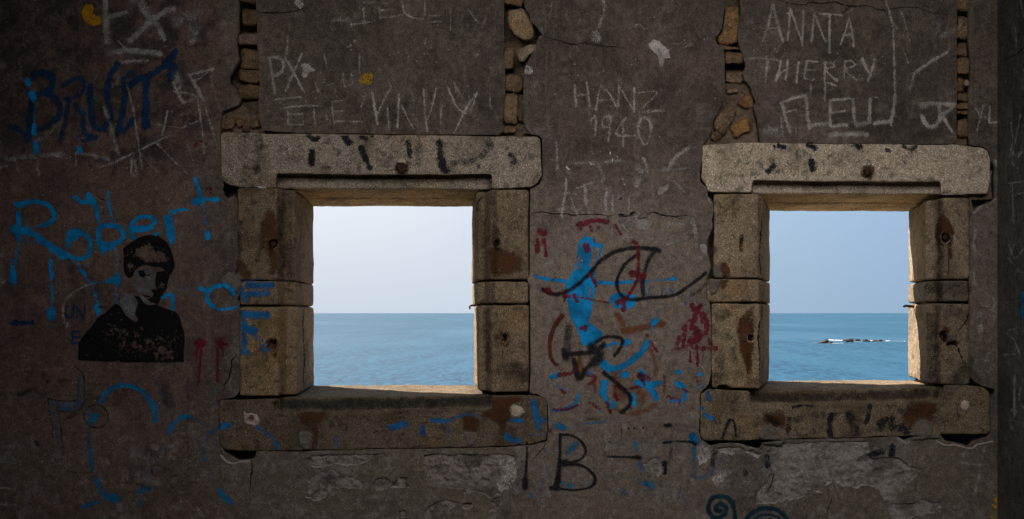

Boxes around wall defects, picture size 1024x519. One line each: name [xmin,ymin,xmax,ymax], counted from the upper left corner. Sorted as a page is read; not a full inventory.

rust [490,229,521,275]
crack [530,211,693,219]
rust [935,215,954,259]
rust [737,309,754,383]
flaking render [305,453,409,501]
flaking render [423,453,519,509]
flaking render [696,437,942,519]